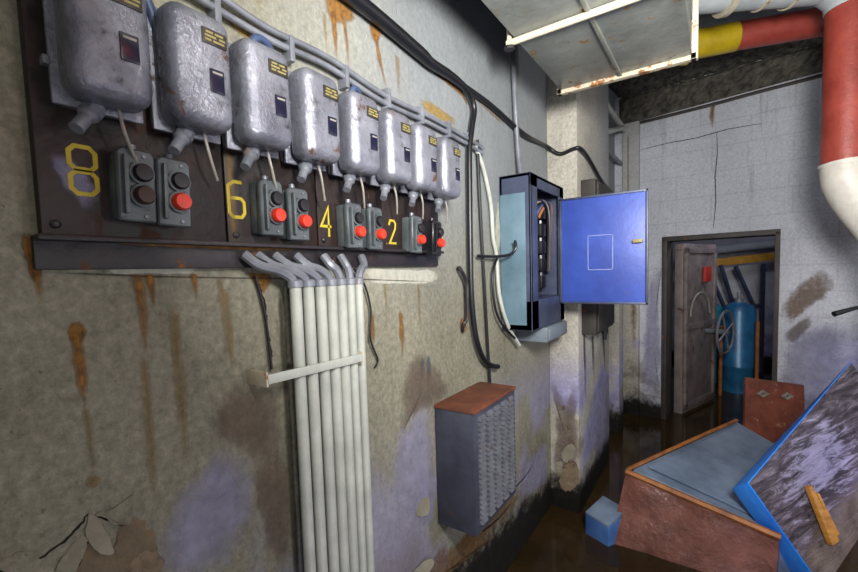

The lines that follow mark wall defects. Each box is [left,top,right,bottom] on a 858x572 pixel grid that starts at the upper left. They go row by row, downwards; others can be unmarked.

rust [327,0,353,50]
rust [370,23,384,76]
rust [135,275,154,338]
rust [69,323,86,395]
leakage [260,298,297,572]
crack [39,514,88,559]
flaking render [55,496,166,572]
spalling [412,558,434,572]